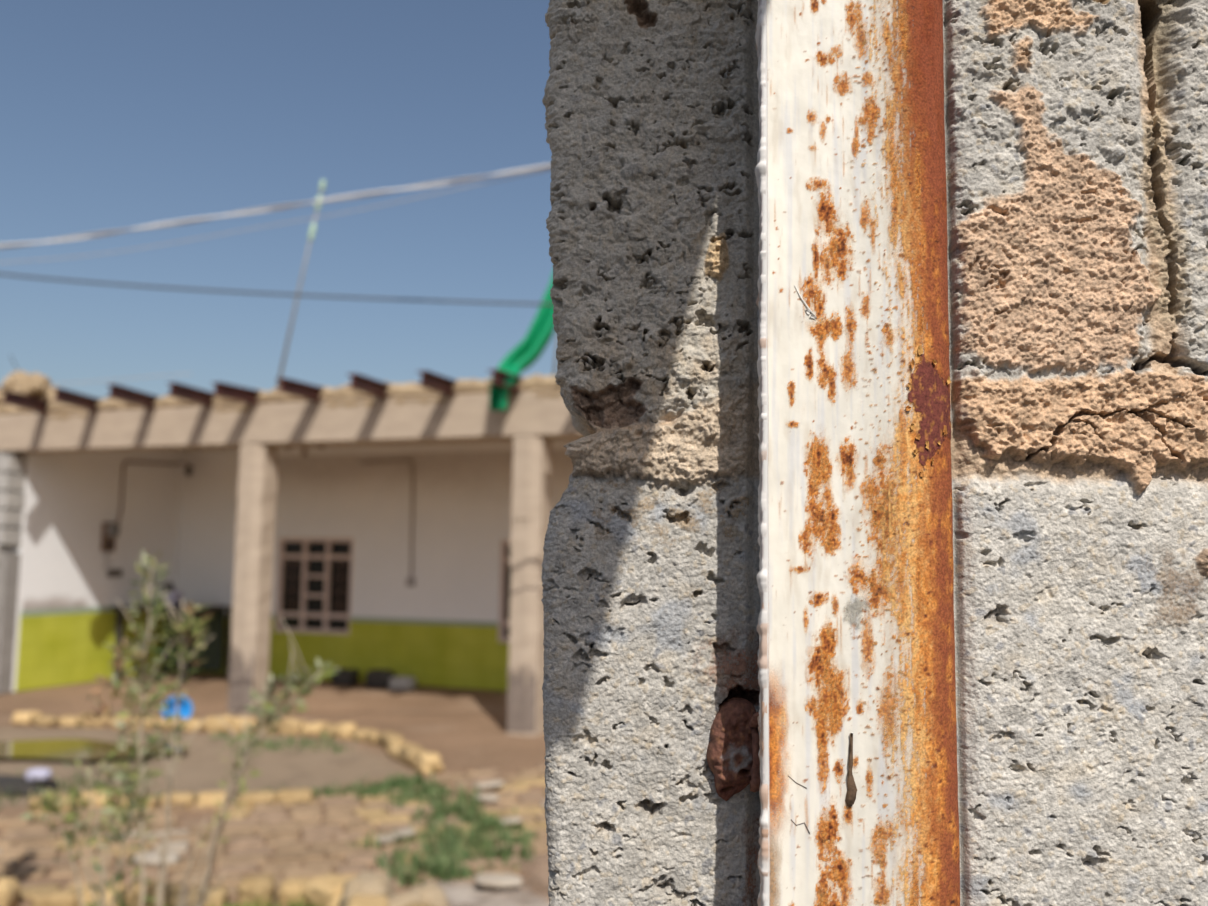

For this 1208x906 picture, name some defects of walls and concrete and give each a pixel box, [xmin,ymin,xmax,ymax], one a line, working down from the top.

crack [1131,0,1208,376]
spalling [568,375,649,430]
rust [780,0,960,906]
crack [1024,407,1195,464]
rust [710,639,787,906]